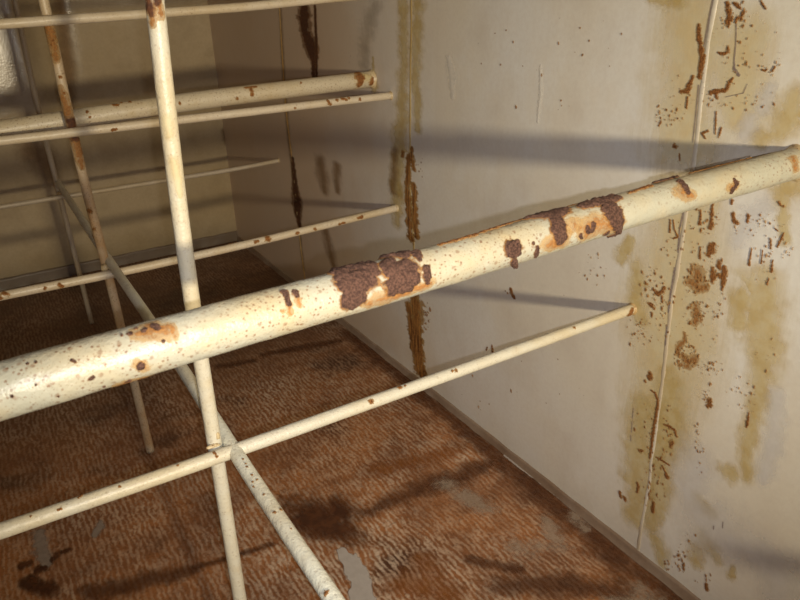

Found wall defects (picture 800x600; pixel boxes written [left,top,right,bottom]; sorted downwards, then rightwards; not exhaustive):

rust [296,4,319,78]
rust [217,146,432,390]
damp [391,0,422,226]
damp [617,204,716,567]
rust [627,204,728,409]
damp [649,0,764,160]
rust [656,23,775,139]
rust [717,0,757,32]
damp [719,271,783,481]
rust [730,178,793,286]
damp [775,181,800,244]
rust [367,390,683,600]